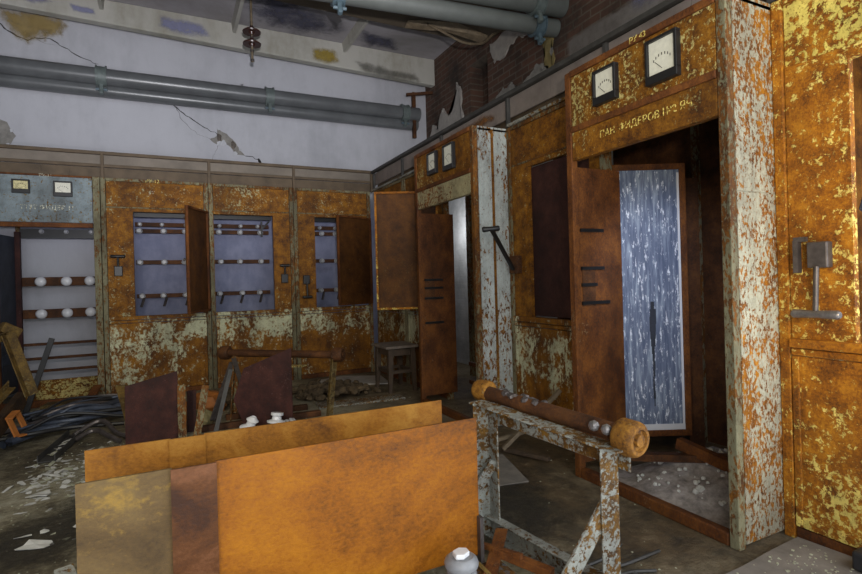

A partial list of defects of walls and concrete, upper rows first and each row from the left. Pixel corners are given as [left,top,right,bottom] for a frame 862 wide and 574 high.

leakage [3,10,63,38]
crack [0,23,96,64]
peeling [490,31,527,64]
peeling [496,36,555,98]
peeling [0,119,16,145]
crack [173,105,218,152]
spalling [210,128,245,156]
peeling [430,82,464,137]